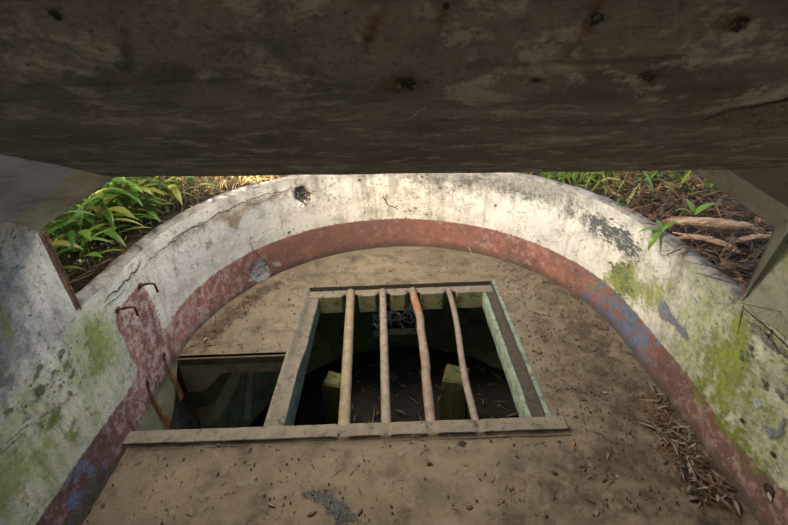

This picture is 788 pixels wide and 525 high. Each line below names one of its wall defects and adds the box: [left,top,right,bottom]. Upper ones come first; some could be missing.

crack [104,187,315,317]
spalling [248,256,282,282]
peeling [658,301,689,340]
peeling [747,321,788,359]
rust [146,379,171,428]
spalling [752,378,788,409]
leakage [39,407,79,443]